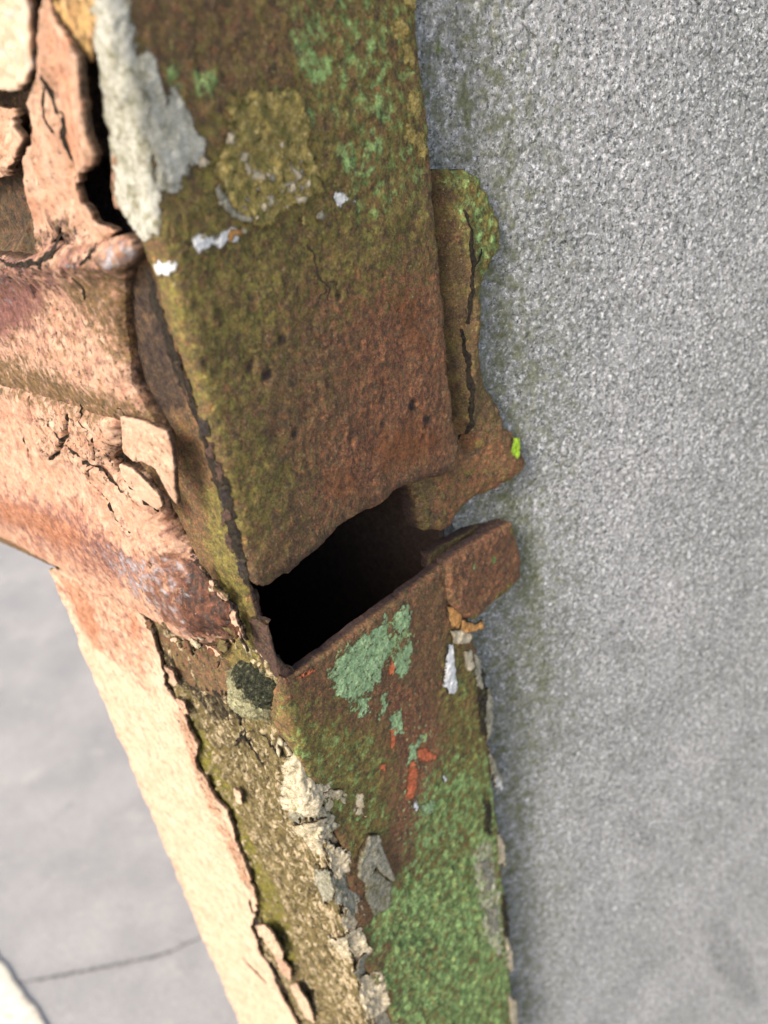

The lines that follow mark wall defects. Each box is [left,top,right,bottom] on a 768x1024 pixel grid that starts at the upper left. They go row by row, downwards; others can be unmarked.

peeling [0,0,208,252]
crack [458,209,482,440]
peeling [119,414,181,510]
corrosion [144,550,249,669]
peeling [164,664,191,715]
peeling [233,786,244,804]
spalling [276,736,398,1024]
peeling [255,923,316,1023]